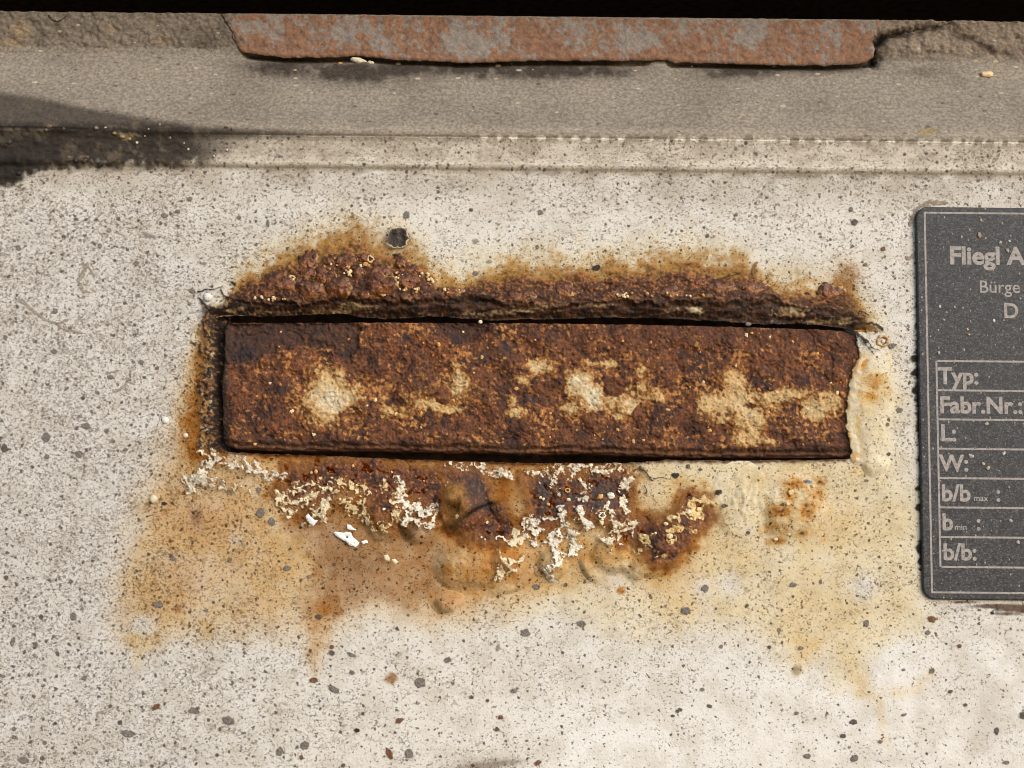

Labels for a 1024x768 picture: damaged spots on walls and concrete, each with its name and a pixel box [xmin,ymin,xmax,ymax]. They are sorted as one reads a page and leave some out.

leakage [0,93,277,187]
corrosion [197,234,867,569]